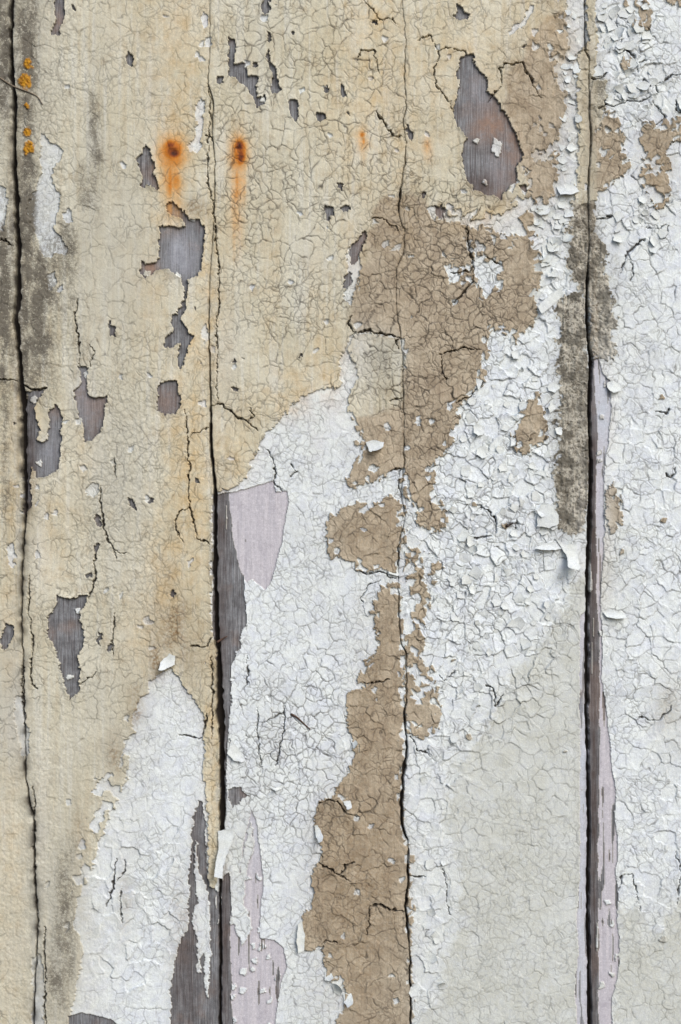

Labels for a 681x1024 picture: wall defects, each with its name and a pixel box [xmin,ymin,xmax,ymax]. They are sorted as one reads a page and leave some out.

crack [591,21,681,129]
rust [150,124,195,229]
rust [224,124,255,268]
peeling [140,202,208,369]
peeling [26,391,63,479]
crack [174,217,256,546]
crack [87,458,127,600]
crack [347,0,452,1024]
peeling [407,0,681,1024]
peeling [48,595,113,700]
crack [179,637,286,768]
peeling [68,332,407,1024]